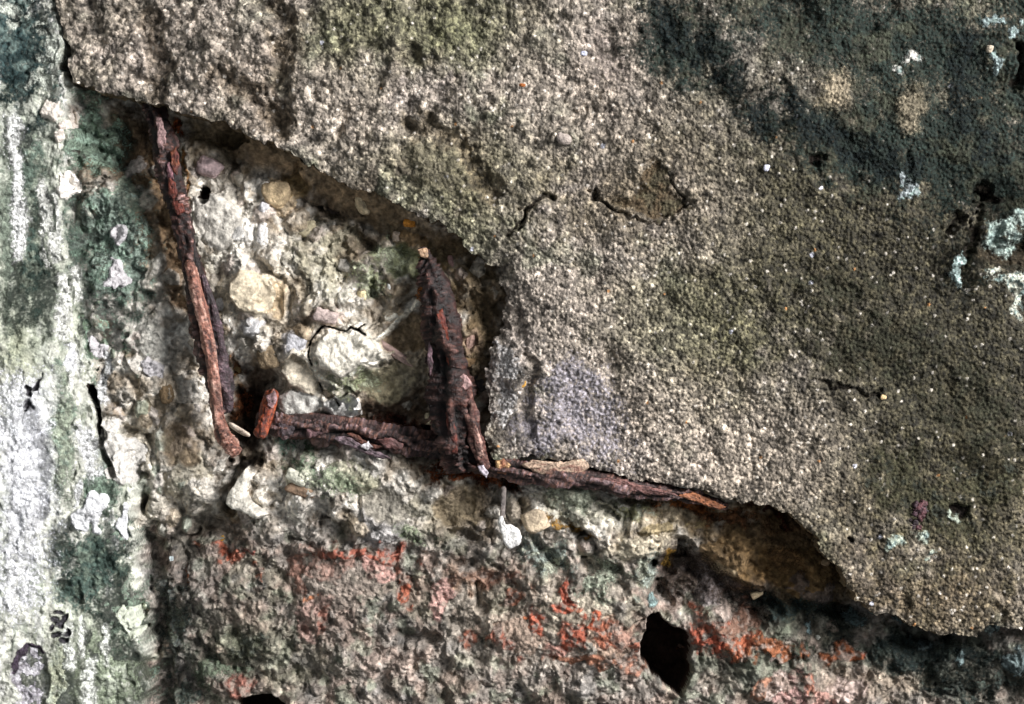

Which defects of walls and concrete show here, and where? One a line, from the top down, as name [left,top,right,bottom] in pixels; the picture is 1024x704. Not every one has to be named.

damp [635,0,925,199]
damp [944,14,1023,174]
corrosion [172,117,191,200]
crack [591,189,653,225]
spalling [40,71,729,511]
damp [949,256,967,287]
damp [982,208,1024,319]
crack [88,385,110,460]
corrosion [230,354,253,420]
corrosion [411,462,522,493]
flaking render [192,540,263,582]
flaking render [286,541,413,644]